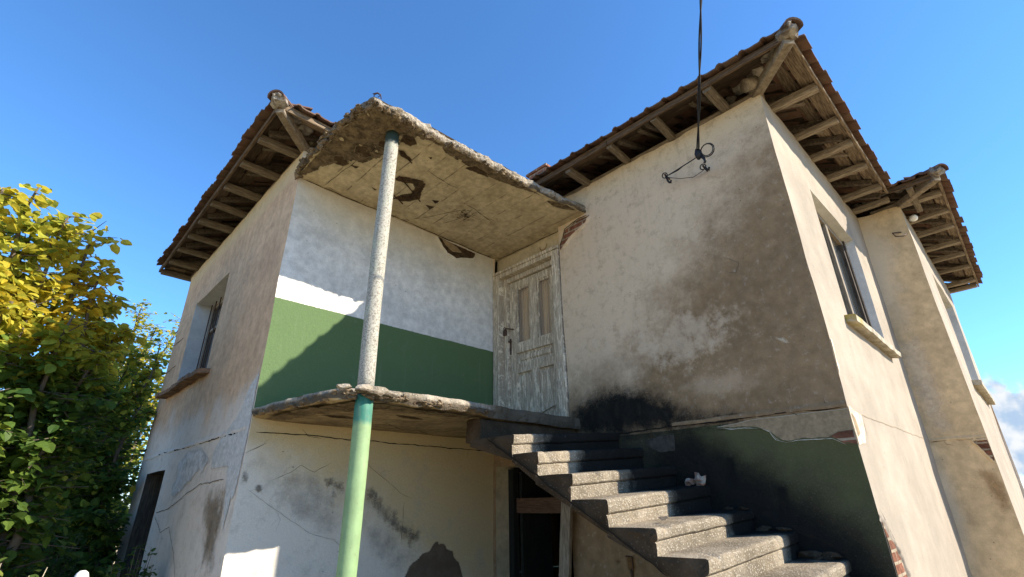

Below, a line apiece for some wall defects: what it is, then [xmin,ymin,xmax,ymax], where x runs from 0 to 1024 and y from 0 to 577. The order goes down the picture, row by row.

spalling [294,92,591,251]
flaking render [436,236,476,262]
damp [571,387,739,440]
peeling [718,406,866,445]
damp [204,492,223,553]
crack [155,424,668,577]
damp [405,542,462,577]
flaking render [880,512,911,577]